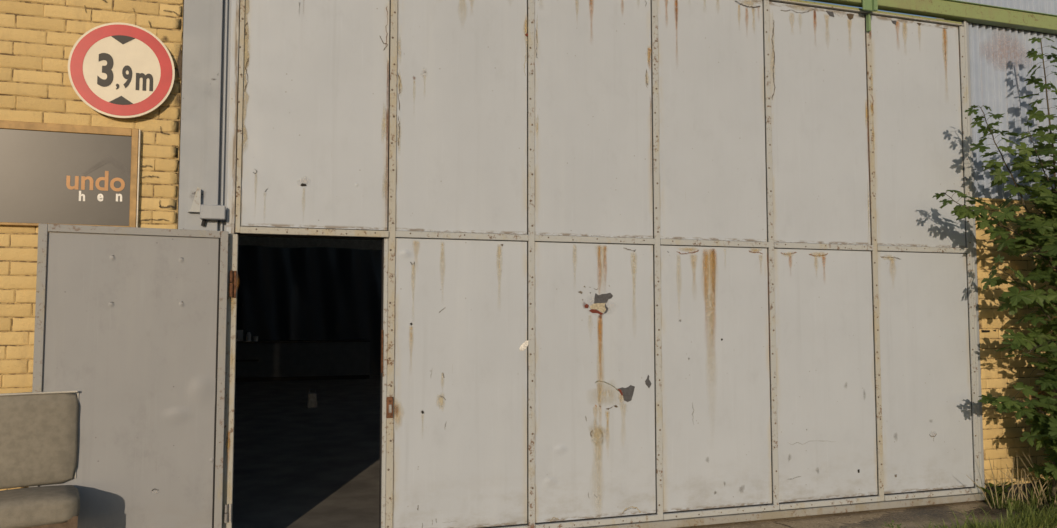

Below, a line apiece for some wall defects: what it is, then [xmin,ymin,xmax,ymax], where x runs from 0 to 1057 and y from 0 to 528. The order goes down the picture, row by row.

rust [705,250,715,290]
peeling [578,286,613,315]
peeling [618,375,651,402]